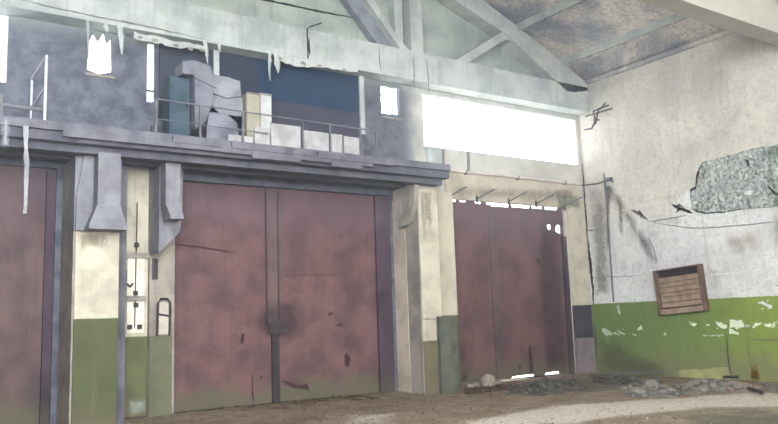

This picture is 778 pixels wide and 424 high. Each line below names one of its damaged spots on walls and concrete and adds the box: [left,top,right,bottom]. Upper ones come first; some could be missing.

flaking render [677,145,778,218]
peeling [602,325,642,336]
peeling [689,319,778,337]